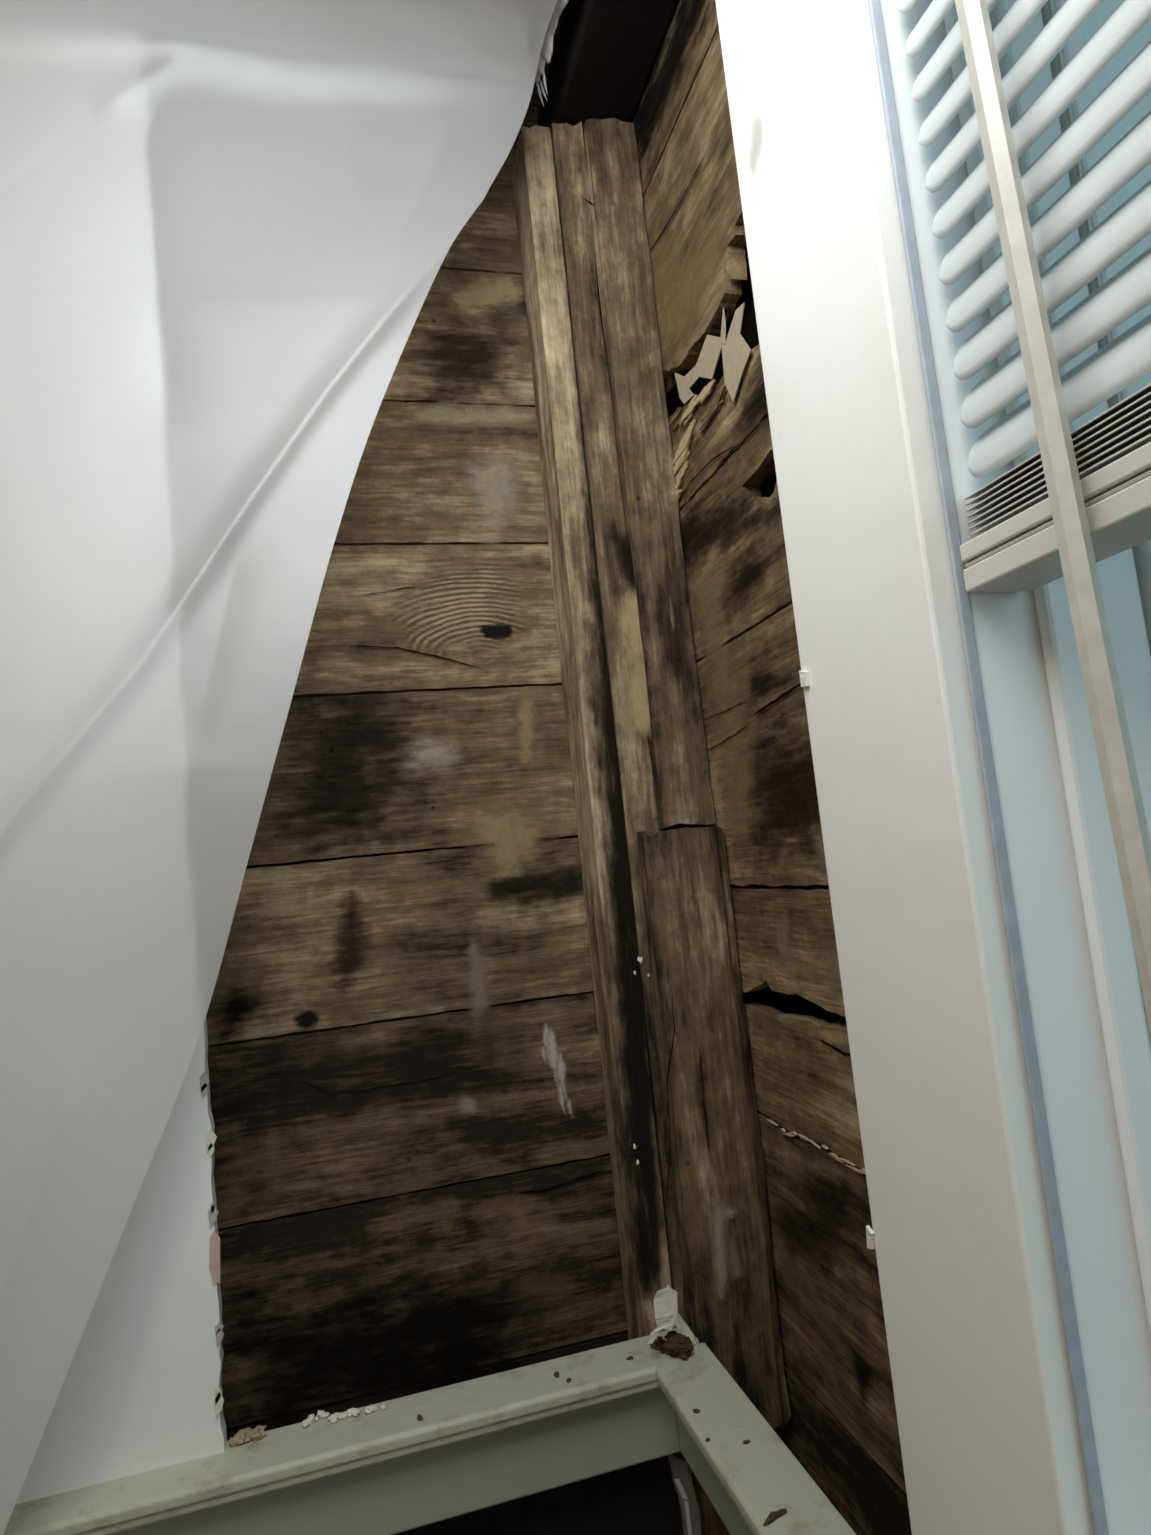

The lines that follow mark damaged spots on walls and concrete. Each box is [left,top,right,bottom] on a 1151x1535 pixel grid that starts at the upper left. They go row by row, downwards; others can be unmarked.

leakage [679,496,781,566]
leakage [693,551,827,869]
crack [742,986,851,1056]
peeling [205,1129,217,1158]
flaking render [208,1201,221,1284]
peeling [215,1323,224,1347]
flaking render [648,1284,700,1354]
flaking render [301,1403,387,1428]
peeling [674,1479,692,1535]